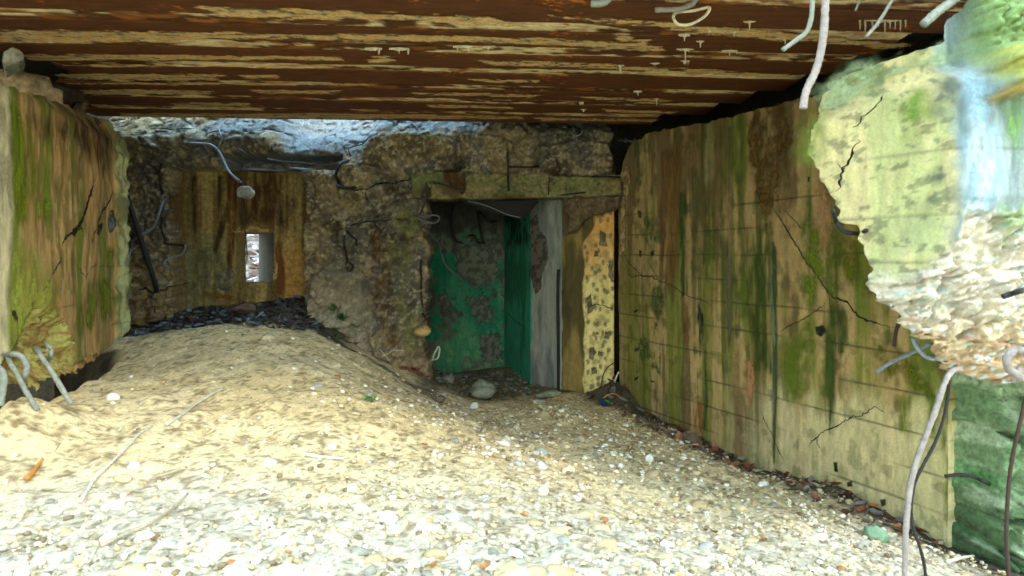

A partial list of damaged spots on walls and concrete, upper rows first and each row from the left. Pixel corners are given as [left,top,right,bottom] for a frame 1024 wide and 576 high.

damp [0,105,13,226]
damp [46,122,109,169]
damp [747,106,792,227]
crack [835,93,884,192]
crack [43,178,113,290]
peeling [343,172,504,365]
peeling [529,214,548,294]
damp [755,243,778,463]
crack [773,209,894,331]
spalling [876,314,939,374]
spalling [1001,287,1024,299]
crack [806,401,883,449]